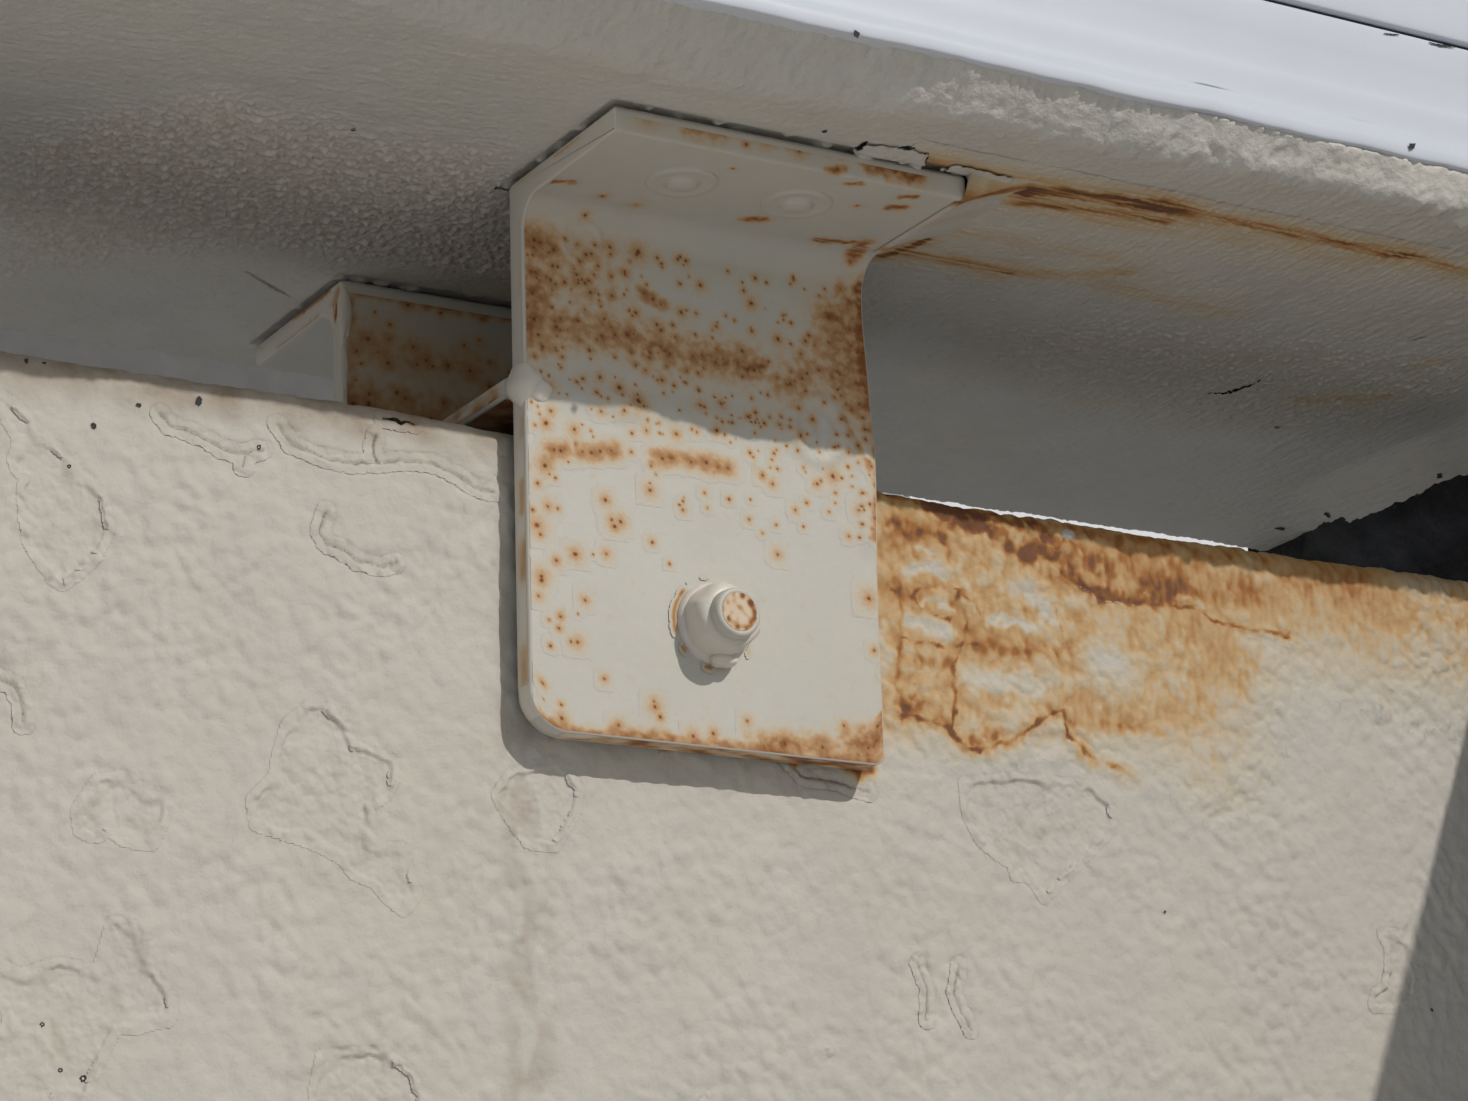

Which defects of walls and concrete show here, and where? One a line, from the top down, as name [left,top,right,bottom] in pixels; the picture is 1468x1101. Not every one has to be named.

crack [855,142,929,163]
crack [150,403,503,577]
corrosion [276,115,1468,832]